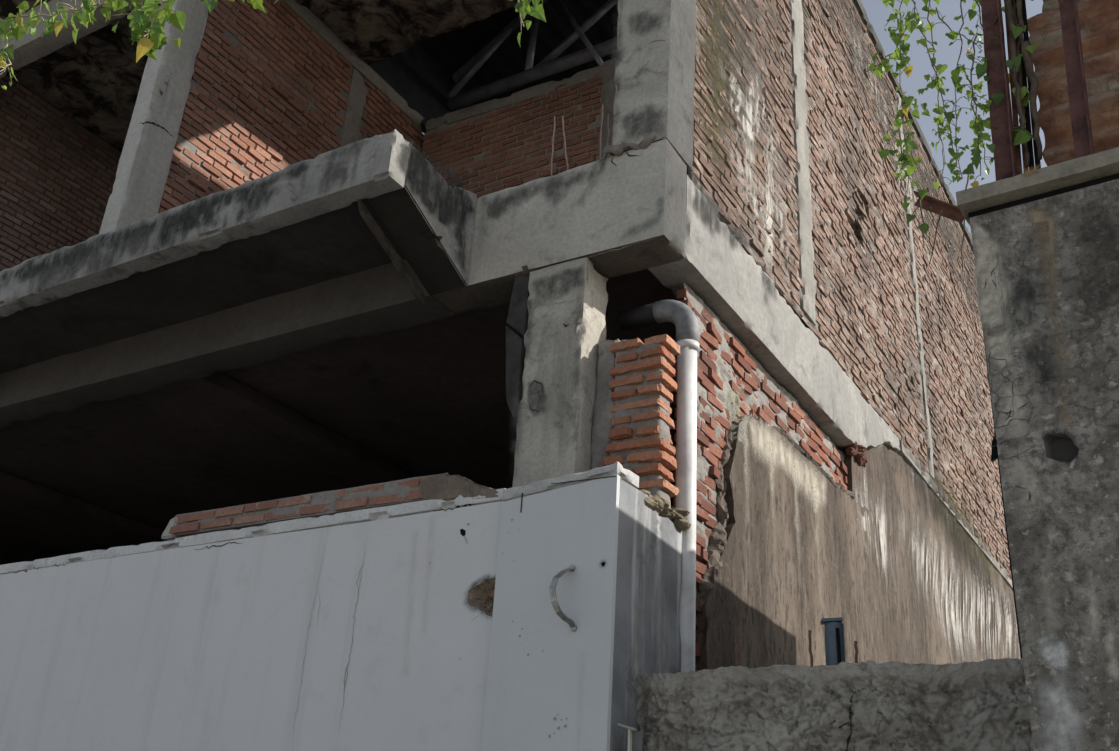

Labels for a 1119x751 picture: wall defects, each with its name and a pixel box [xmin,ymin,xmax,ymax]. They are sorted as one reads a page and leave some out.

crack [138,121,172,137]
spalling [600,134,656,161]
crack [988,343,1034,461]
spalling [843,441,868,467]
spalling [1043,432,1079,466]
spalling [697,414,859,608]
leakage [861,498,887,567]
spalling [467,576,496,620]
leakage [912,541,1012,650]